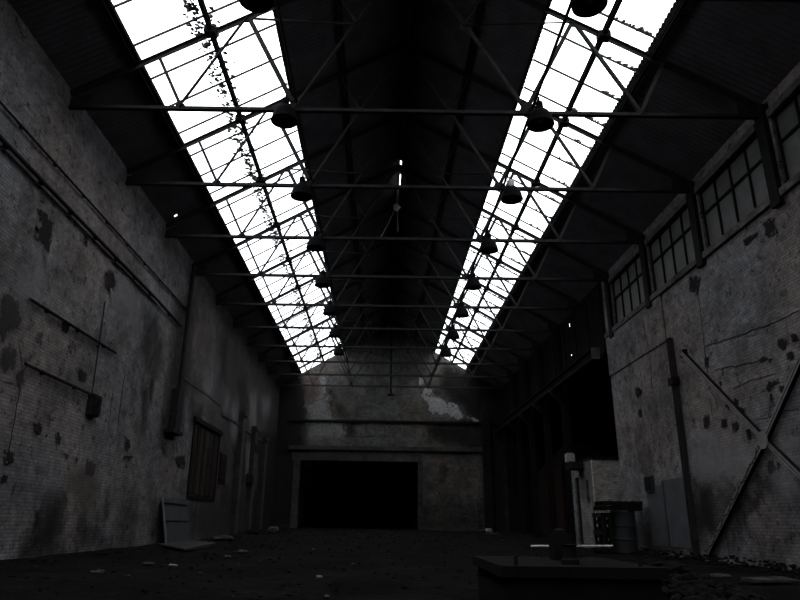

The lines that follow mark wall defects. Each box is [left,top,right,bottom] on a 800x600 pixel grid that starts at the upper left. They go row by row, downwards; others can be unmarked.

peeling [419,377,479,422]
crack [697,292,799,428]